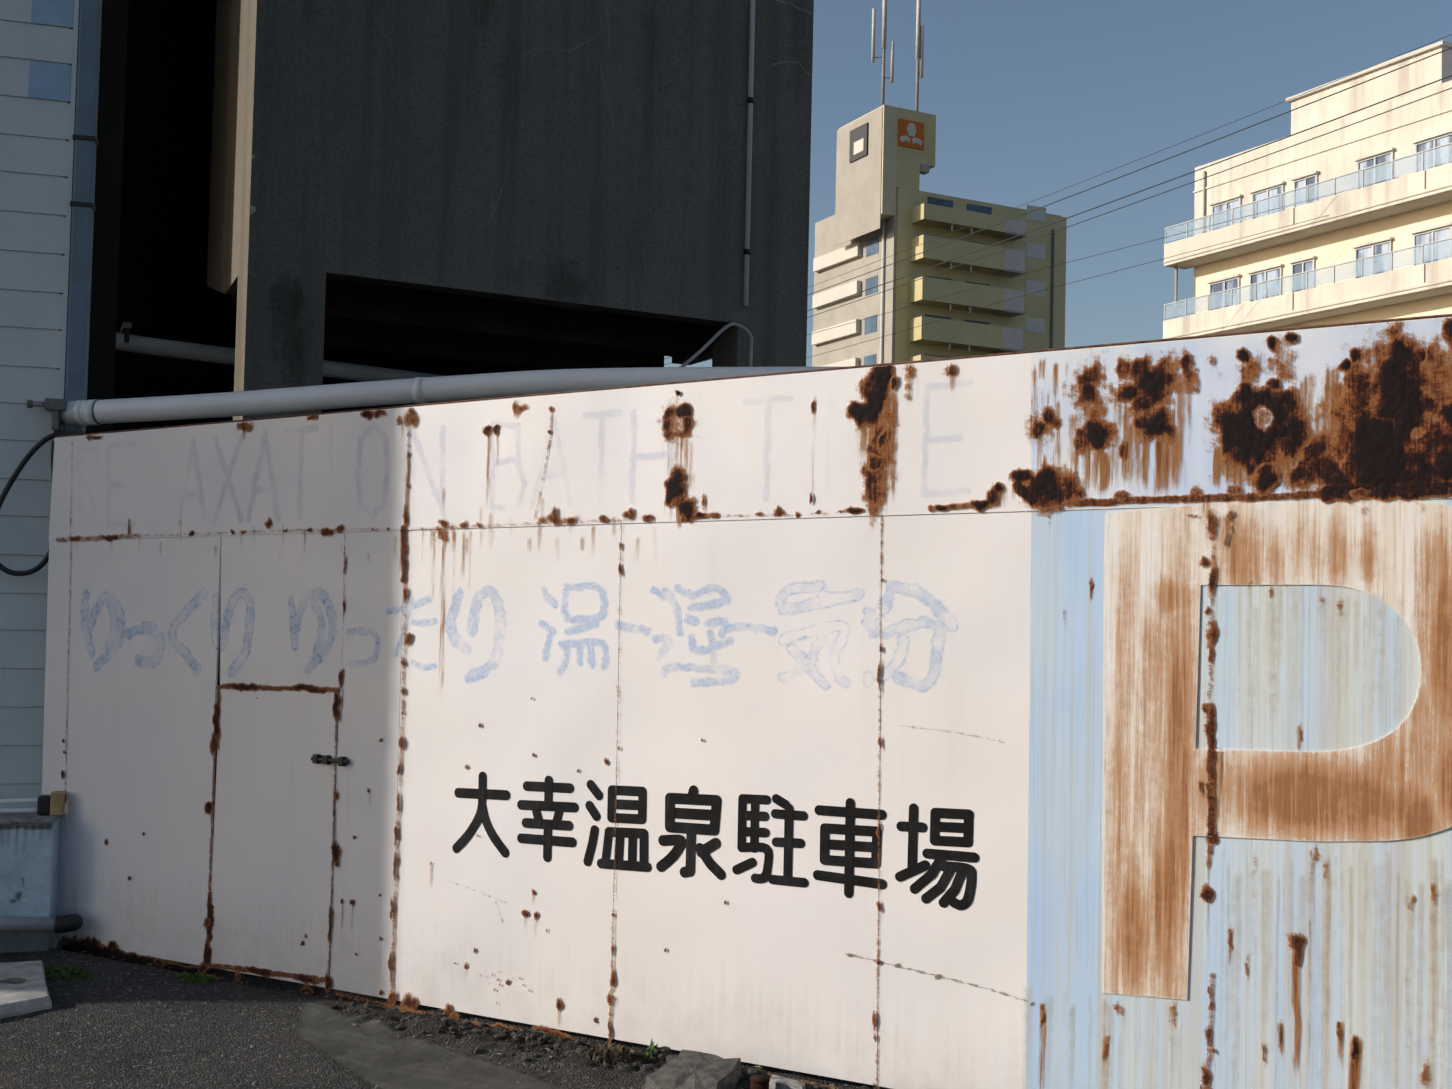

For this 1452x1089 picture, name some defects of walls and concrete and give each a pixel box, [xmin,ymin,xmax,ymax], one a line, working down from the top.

rust [236,421,253,434]
rust [360,410,387,421]
rust [482,401,527,499]
rust [658,390,719,526]
rust [928,317,1452,524]
rust [422,525,464,569]
rust [1109,518,1452,1026]
rust [60,683,574,1040]
rust [1262,923,1310,1067]